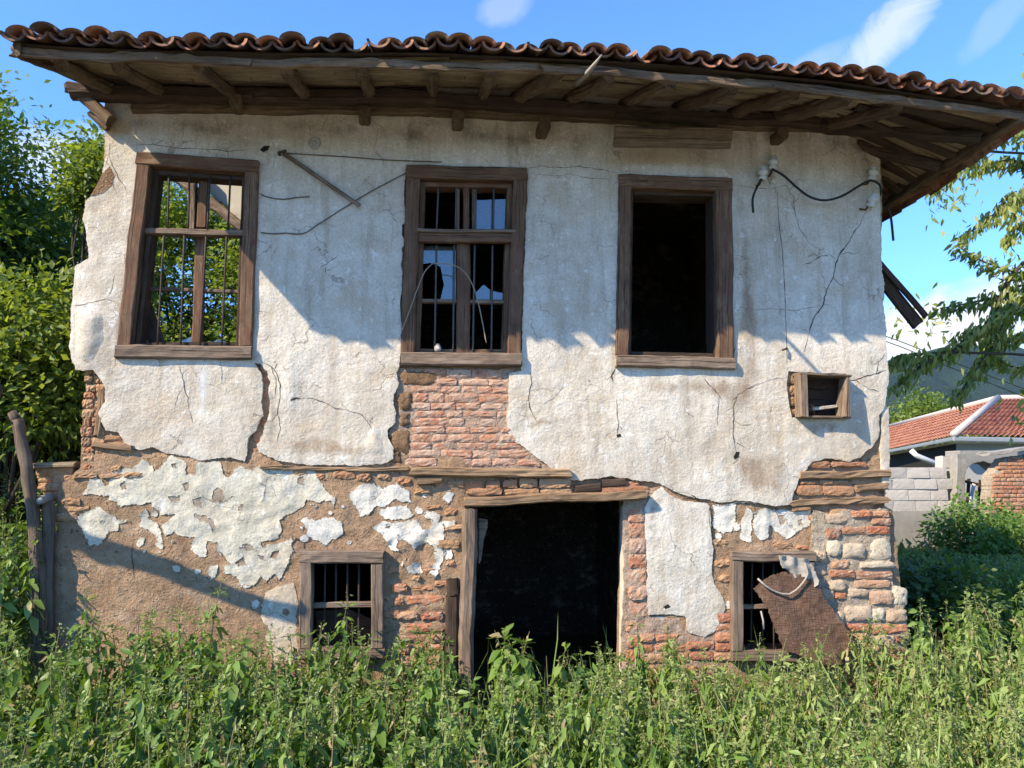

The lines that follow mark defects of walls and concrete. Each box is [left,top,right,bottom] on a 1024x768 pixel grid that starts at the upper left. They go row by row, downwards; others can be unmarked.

crack [736,185,866,353]
peeling [56,367,734,711]
crack [705,379,772,449]
spalling [712,458,910,712]